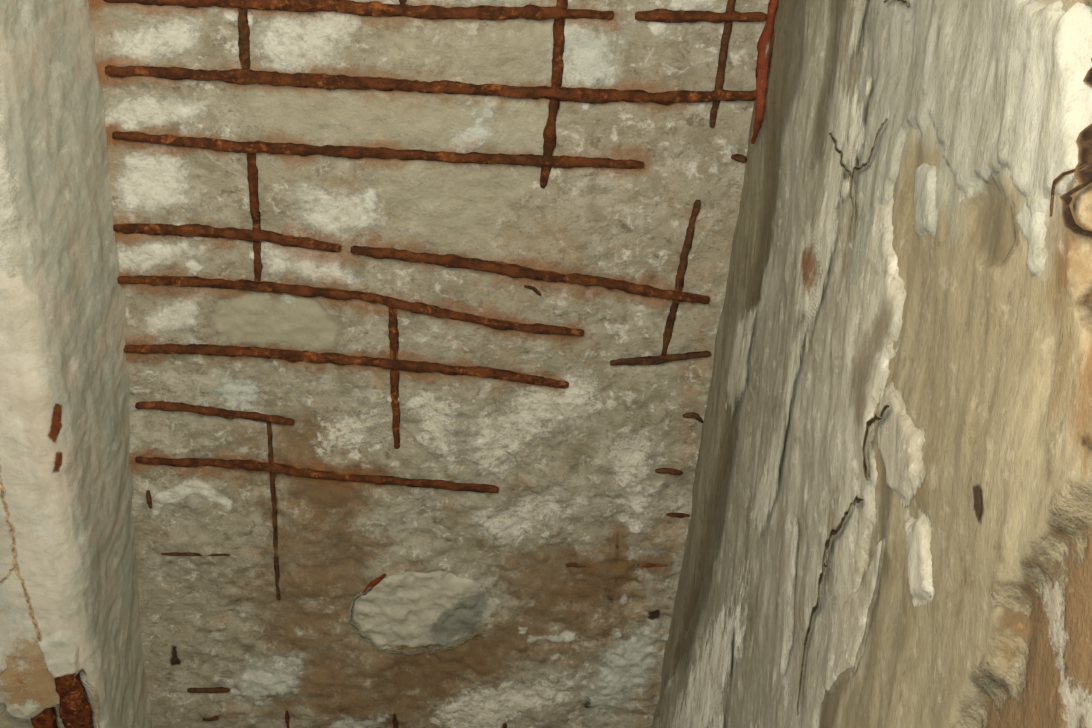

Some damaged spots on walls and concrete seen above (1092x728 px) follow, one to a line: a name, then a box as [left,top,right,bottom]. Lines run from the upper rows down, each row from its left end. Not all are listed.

crack [829,119,888,236]
peeling [208,291,343,352]
flaking render [652,0,1092,728]
crack [0,466,44,657]
crack [797,404,889,715]
rust [0,641,59,707]
spalling [0,700,64,728]
peeling [33,629,100,728]
spalling [170,646,181,665]
damp [429,622,669,728]